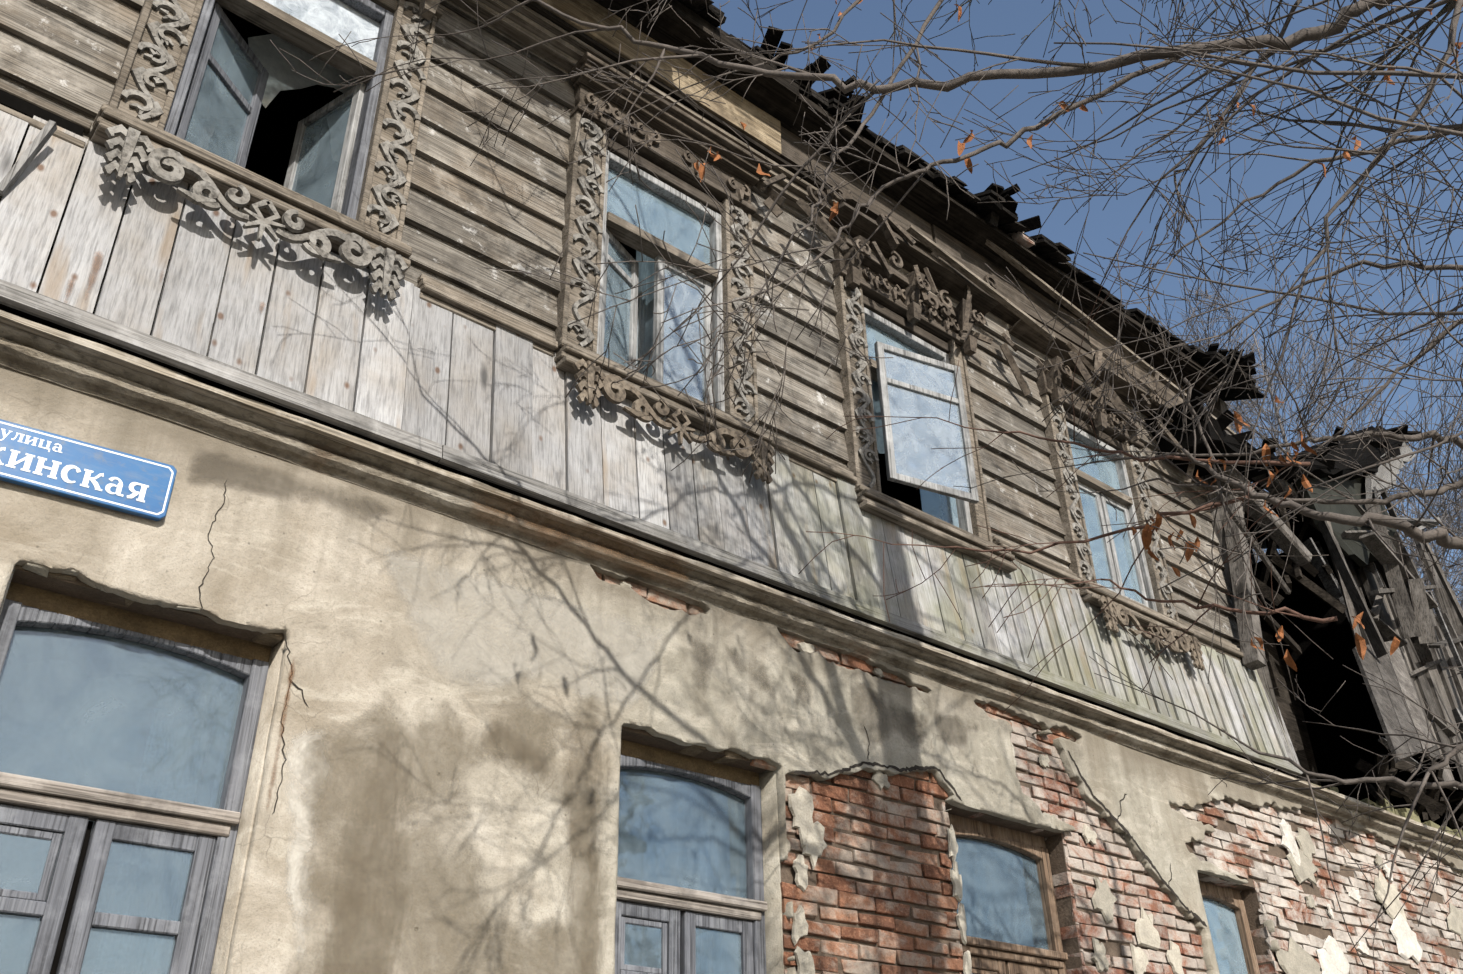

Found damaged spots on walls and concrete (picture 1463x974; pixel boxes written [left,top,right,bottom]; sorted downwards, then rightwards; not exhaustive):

crack [198,482,226,612]
crack [272,637,308,814]
spalling [780,632,923,691]
leakage [287,710,593,974]
spalling [750,759,972,974]
spalling [975,702,1207,974]
spalling [1170,800,1463,974]